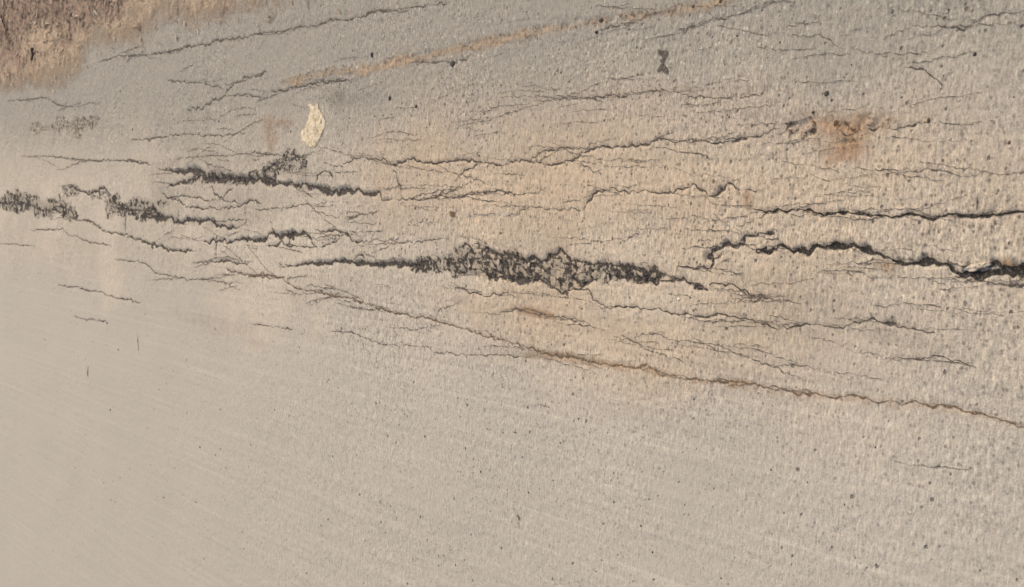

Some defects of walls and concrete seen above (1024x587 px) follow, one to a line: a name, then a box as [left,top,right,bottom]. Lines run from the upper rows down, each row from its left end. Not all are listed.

crack [1,0,1024,428]
spalling [408,243,708,298]